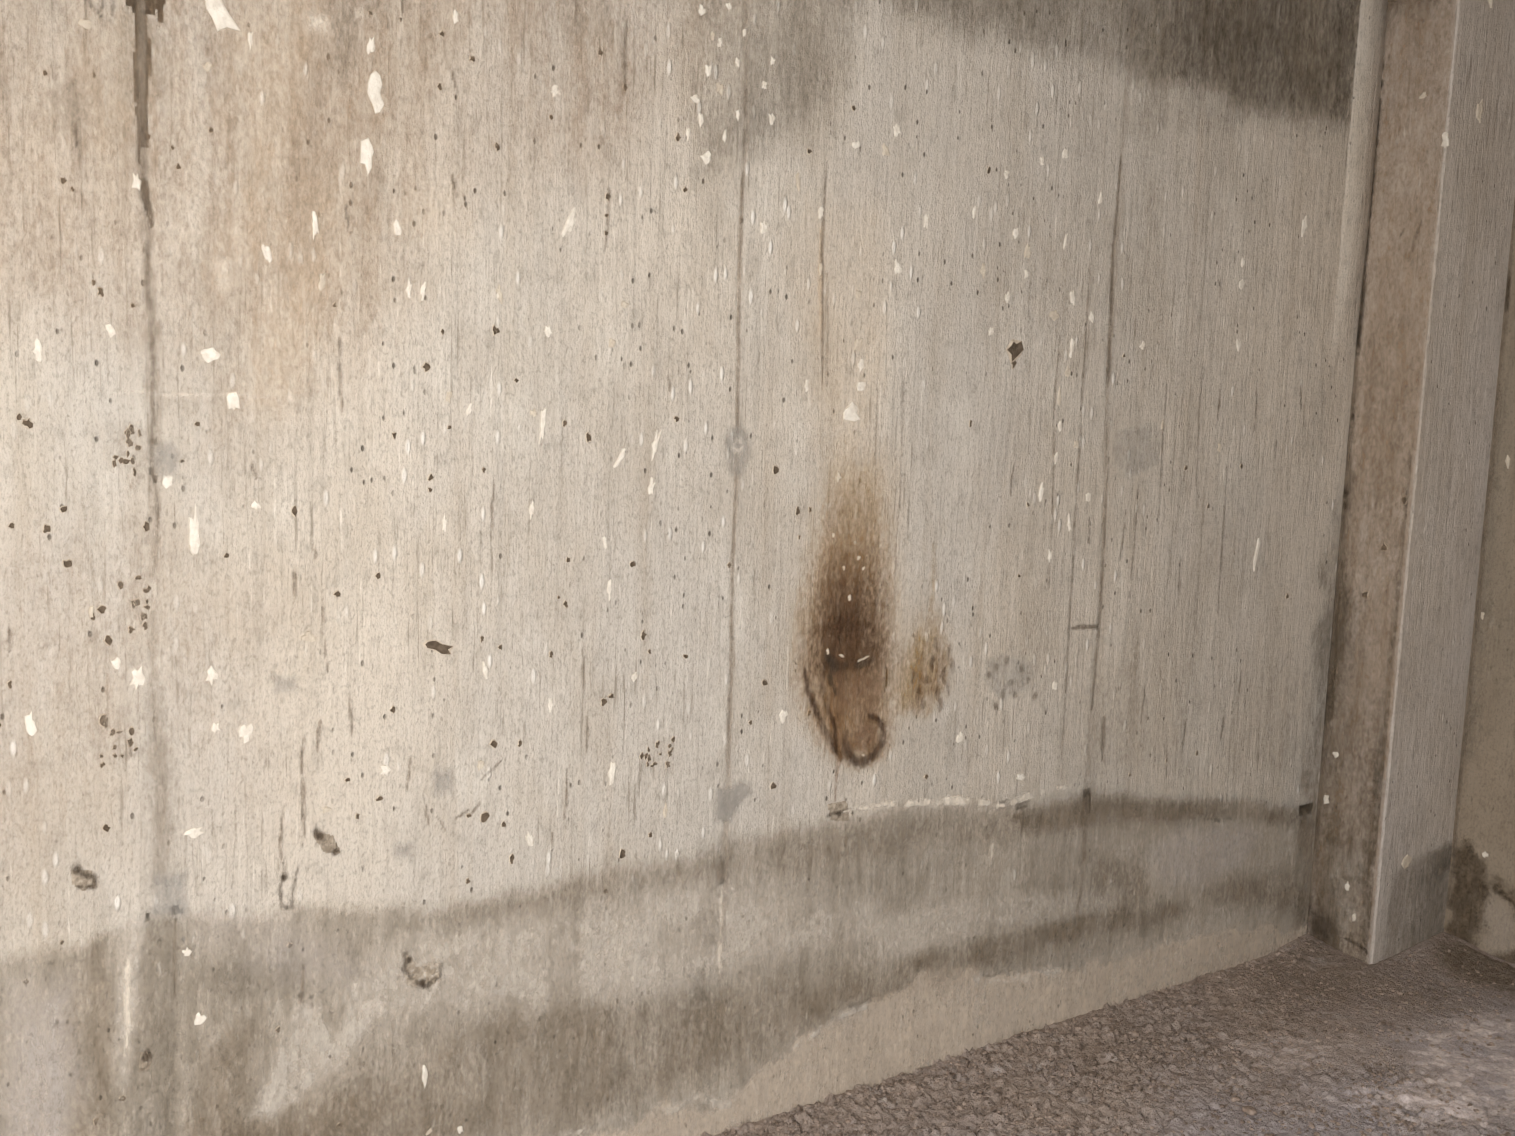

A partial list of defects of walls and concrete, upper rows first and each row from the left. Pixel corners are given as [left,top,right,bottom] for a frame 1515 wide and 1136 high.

water stain [1114,0,1356,109]
water stain [1330,171,1438,707]
rust [804,510,884,766]
rust [902,634,944,712]
water stain [0,563,1404,1136]
water stain [1406,841,1515,986]
water stain [1379,1019,1515,1128]